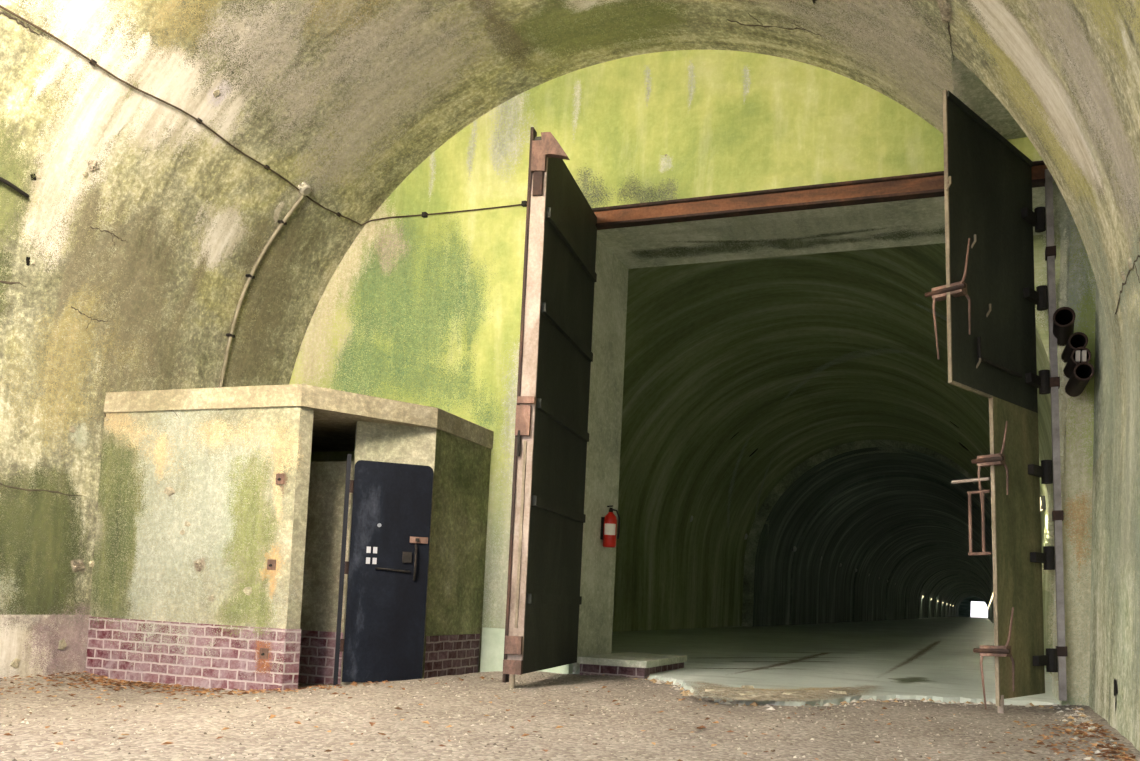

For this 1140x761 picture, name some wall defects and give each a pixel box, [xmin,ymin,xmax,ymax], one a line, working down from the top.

leakage [571,80,582,143]
leakage [0,0,541,628]
crack [1115,237,1140,314]
crack [0,483,85,497]